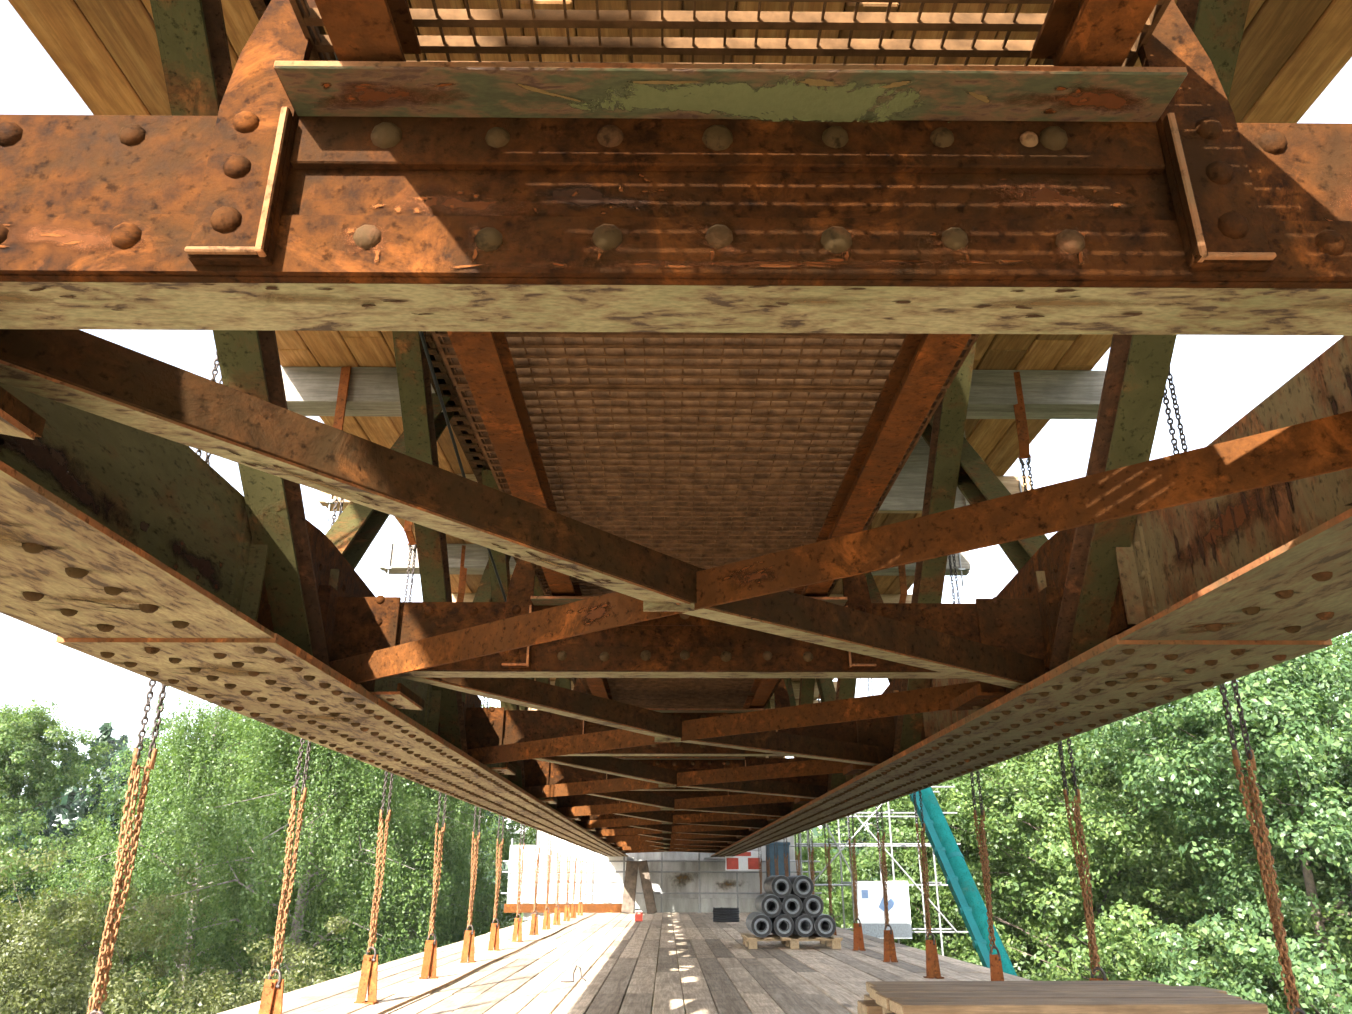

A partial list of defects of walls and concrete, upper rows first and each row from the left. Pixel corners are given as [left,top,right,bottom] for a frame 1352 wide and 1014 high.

peeling [517,76,923,122]
rust [993,178,1098,211]
rust [0,224,112,250]
rust [373,190,504,268]
rust [590,227,1028,268]
rust [1164,482,1294,572]
rust [172,540,222,591]